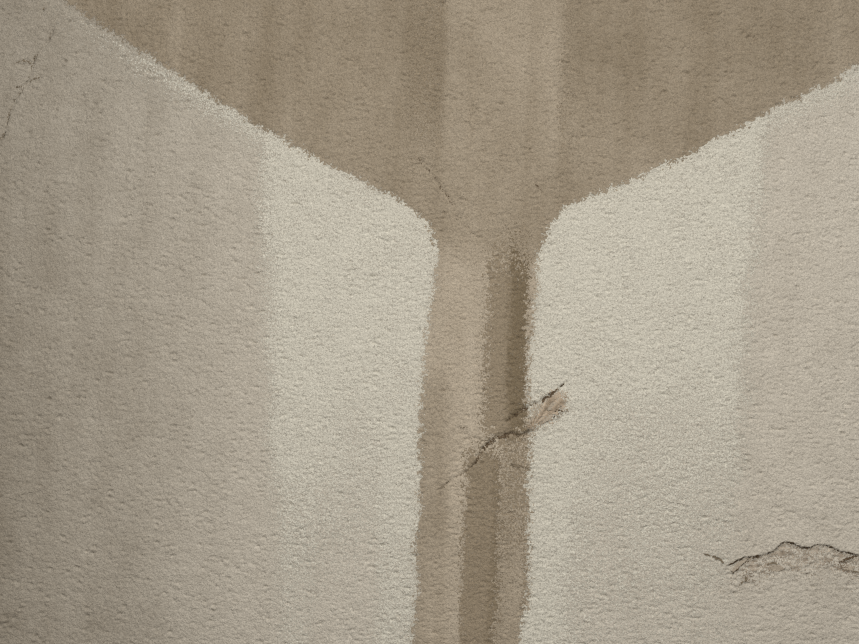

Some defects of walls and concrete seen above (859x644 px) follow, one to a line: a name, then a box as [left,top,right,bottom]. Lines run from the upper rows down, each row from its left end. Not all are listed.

crack [440,383,564,489]
crack [704,541,859,584]